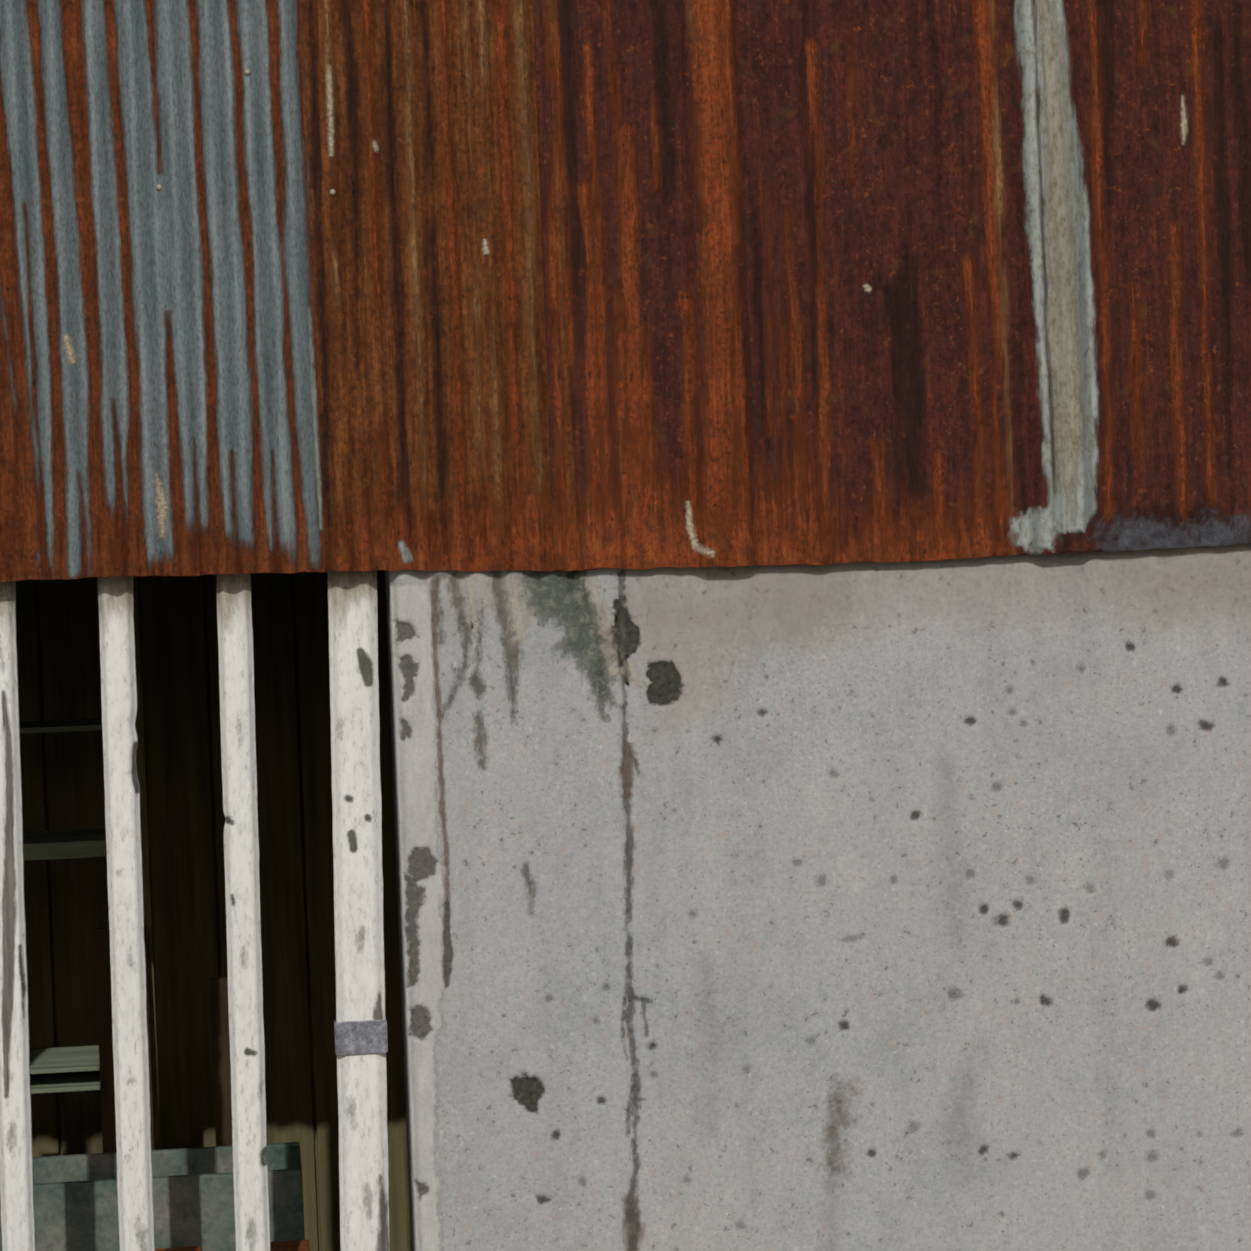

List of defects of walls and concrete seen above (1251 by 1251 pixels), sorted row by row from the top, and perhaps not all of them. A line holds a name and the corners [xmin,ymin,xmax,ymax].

rust [0,0,1026,613]
rust [1087,0,1251,552]
damp [475,714,486,769]
damp [432,570,641,719]
spalling [646,660,684,705]
crack [618,572,652,1251]
spalling [510,1073,545,1112]